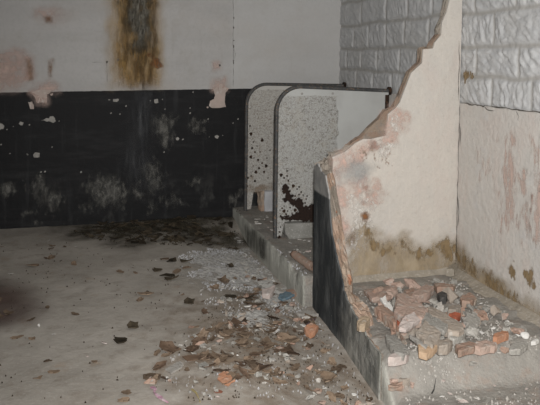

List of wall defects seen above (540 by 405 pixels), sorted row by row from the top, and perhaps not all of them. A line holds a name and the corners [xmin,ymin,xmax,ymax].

rust [116,0,162,86]
peeling [28,84,57,109]
peeling [207,79,229,108]
rust [278,170,314,239]
peeling [337,176,379,232]
leakage [347,223,540,316]